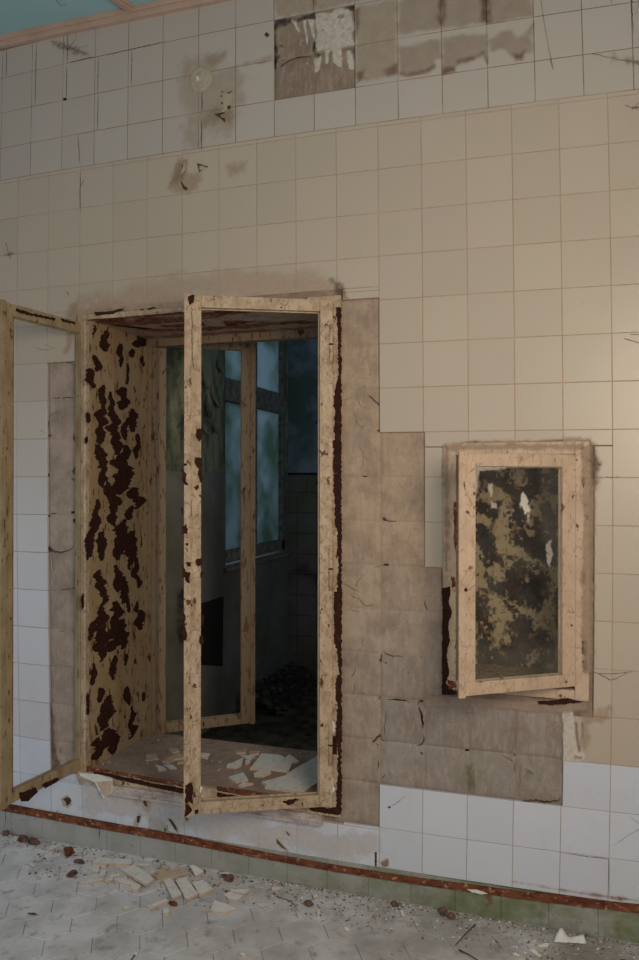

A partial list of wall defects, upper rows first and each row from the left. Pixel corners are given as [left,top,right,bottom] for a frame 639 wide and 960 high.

peeling [275,7,355,100]
peeling [49,325,147,769]
corrosion [309,307,343,815]
peeling [335,298,563,826]